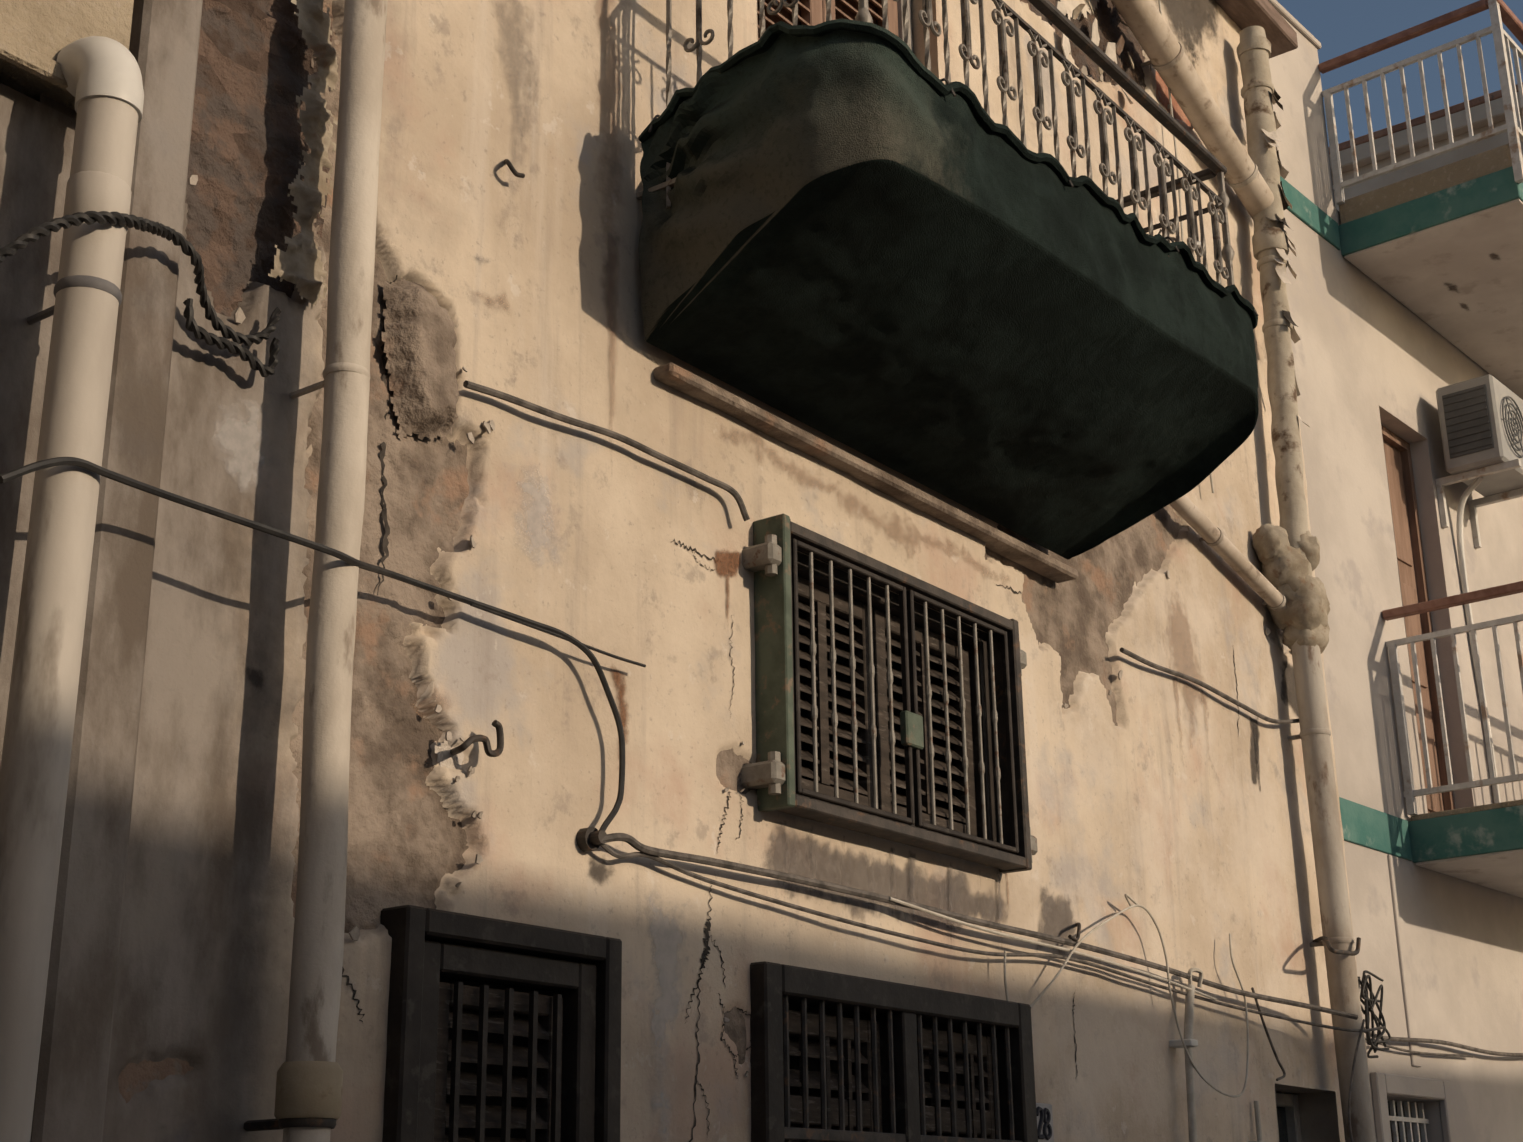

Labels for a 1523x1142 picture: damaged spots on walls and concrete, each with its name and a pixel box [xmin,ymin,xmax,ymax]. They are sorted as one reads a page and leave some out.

crack [377,275,397,596]
spalling [344,252,495,941]
rust [715,551,740,617]
spalling [984,505,1190,726]
spalling [289,679,305,918]
crack [342,966,365,1022]
crack [685,792,752,1142]
spalling [723,1006,749,1077]
damp [769,827,1003,926]